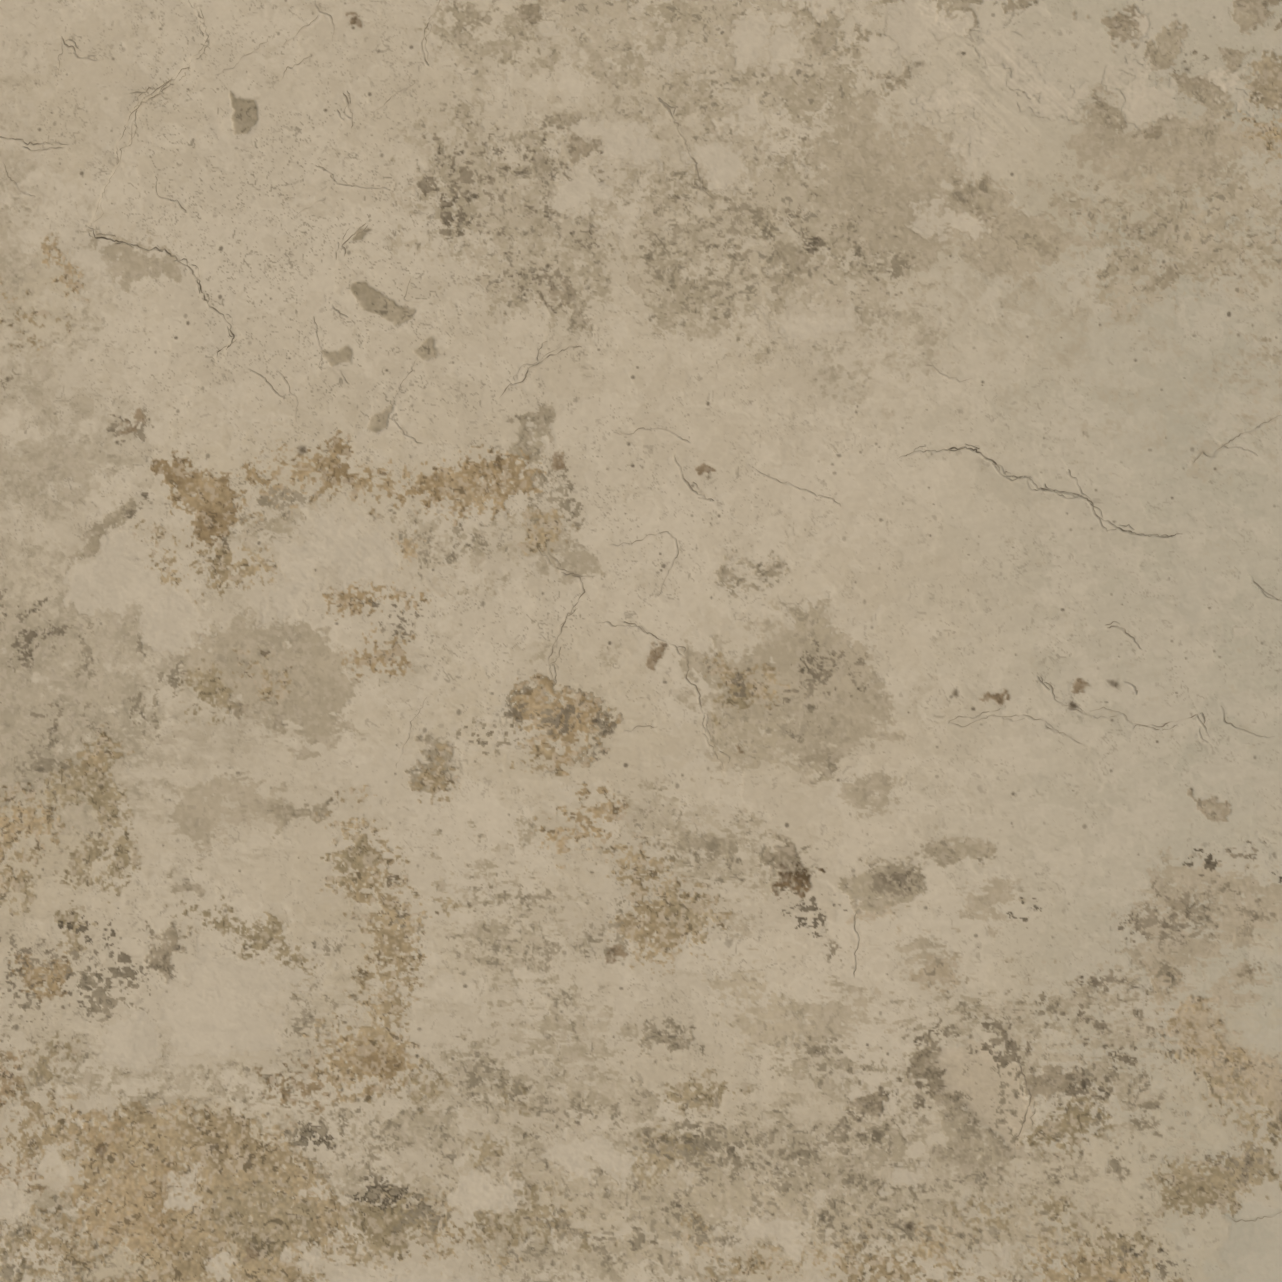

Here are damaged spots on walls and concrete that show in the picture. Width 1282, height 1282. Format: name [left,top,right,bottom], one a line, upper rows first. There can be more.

crack [88,0,237,356]
peeling [228,90,260,136]
crack [337,0,441,129]
peeling [348,0,1282,372]
crack [252,304,350,422]
crack [899,444,1180,538]
crack [532,544,730,768]
water stain [751,832,852,965]
water stain [1105,815,1282,961]
water stain [485,983,709,1076]
water stain [751,1010,878,1126]
water stain [936,967,1282,1228]